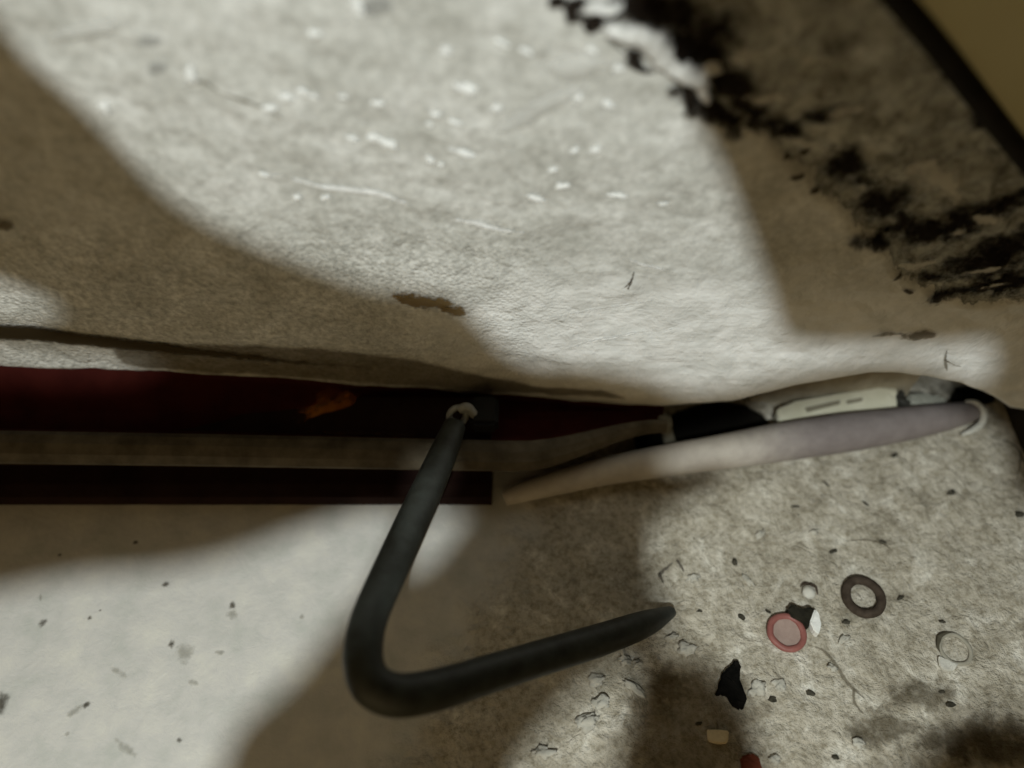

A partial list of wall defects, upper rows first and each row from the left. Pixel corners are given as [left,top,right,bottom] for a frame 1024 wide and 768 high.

damp [548,0,620,34]
damp [609,40,654,74]